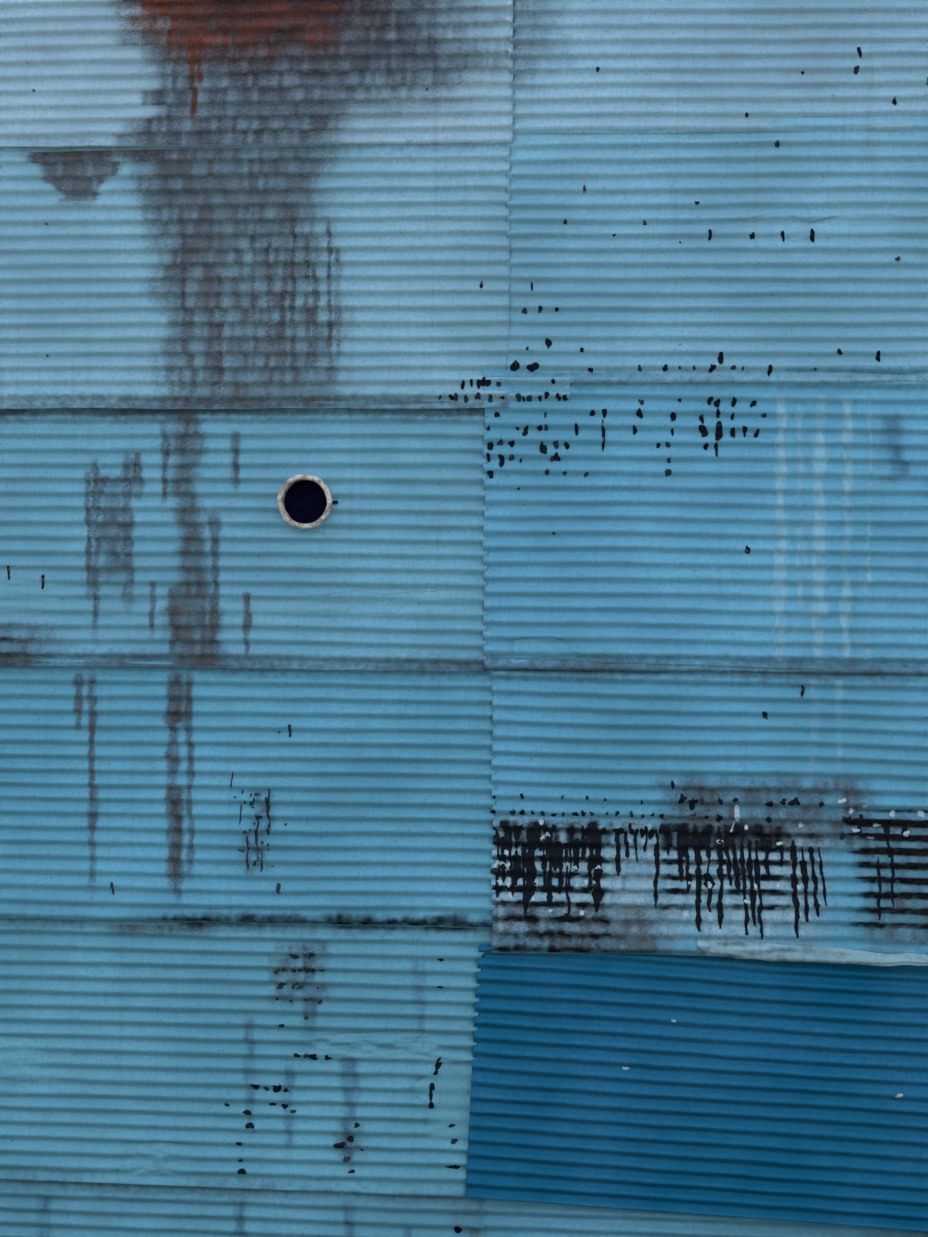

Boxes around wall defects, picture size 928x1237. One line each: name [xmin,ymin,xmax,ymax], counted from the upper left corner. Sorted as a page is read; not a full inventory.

corrosion [122,0,478,145]
water stain [838,798,928,943]